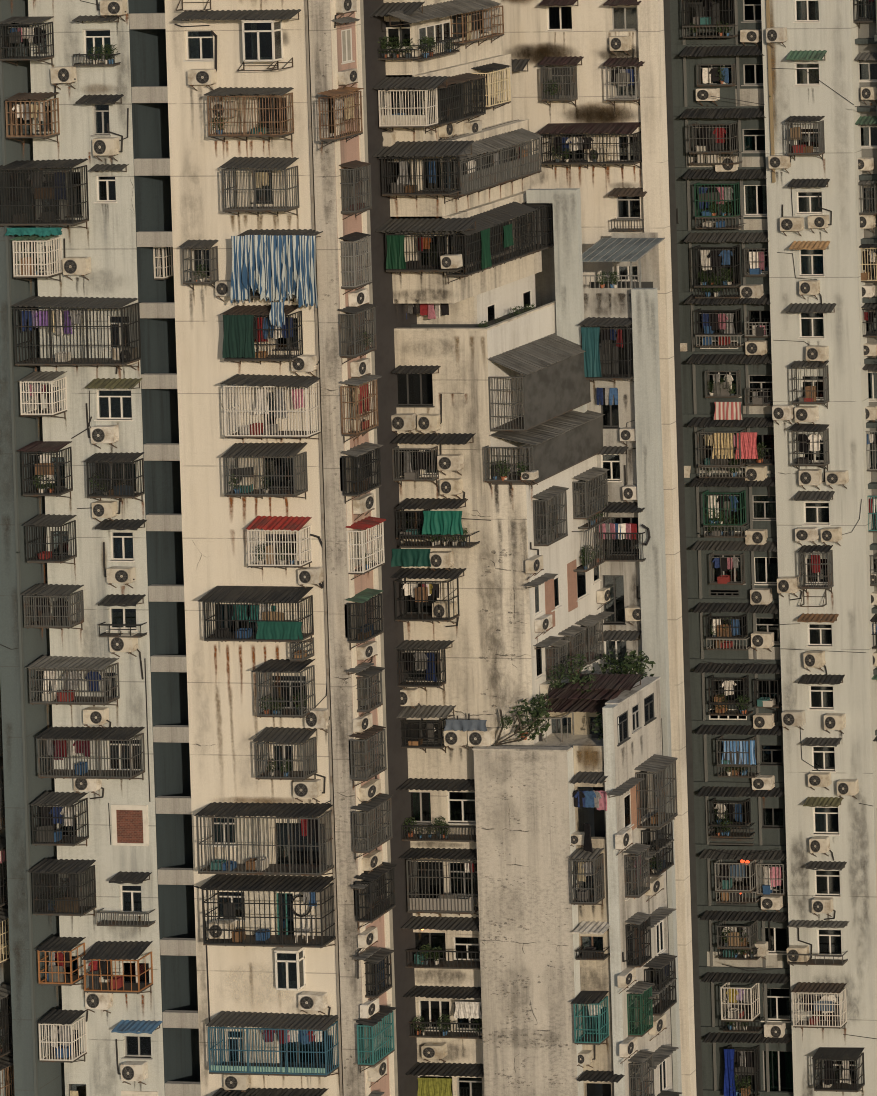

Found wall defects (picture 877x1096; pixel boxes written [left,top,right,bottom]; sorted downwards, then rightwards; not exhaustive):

rust [229,497,271,516]
rust [214,646,279,688]